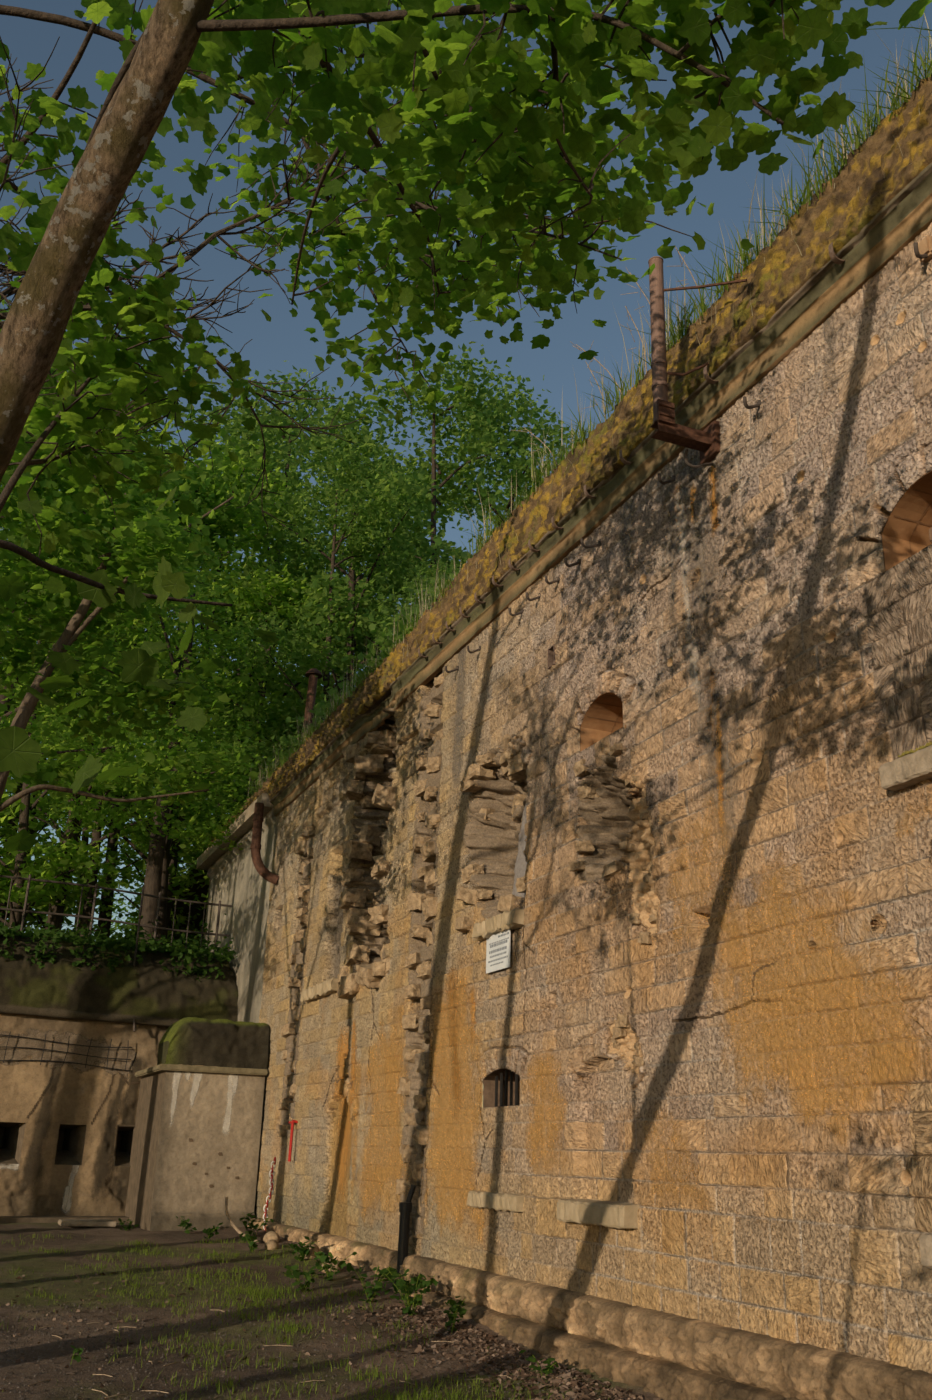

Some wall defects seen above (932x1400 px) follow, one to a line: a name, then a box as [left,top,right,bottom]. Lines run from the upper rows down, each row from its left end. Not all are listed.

spalling [455,734,527,933]
spalling [568,743,660,944]
spalling [337,671,445,1236]
crack [672,962,778,1022]
damp [62,1059,142,1212]
damp [171,1071,202,1121]
damp [223,1074,238,1133]